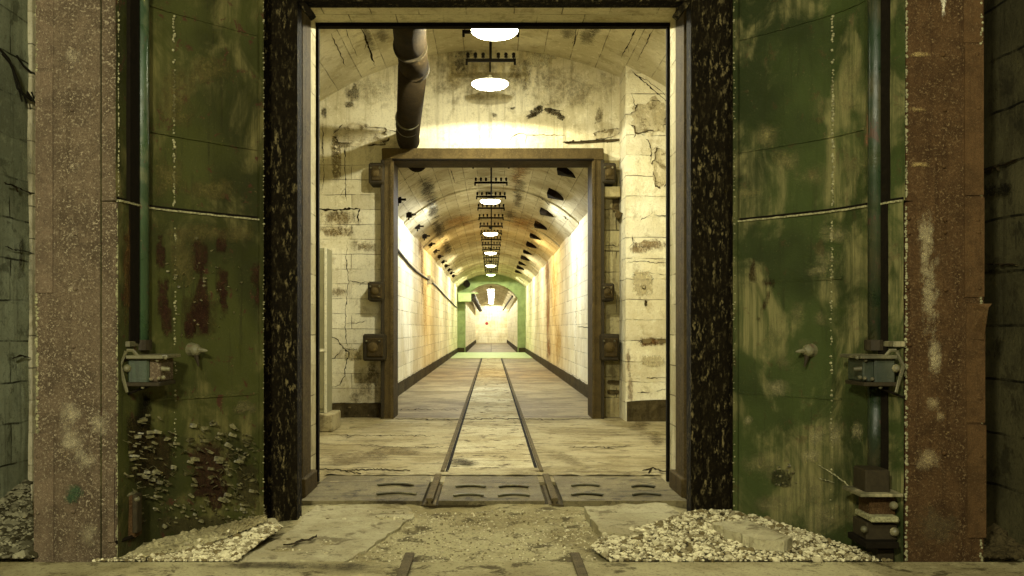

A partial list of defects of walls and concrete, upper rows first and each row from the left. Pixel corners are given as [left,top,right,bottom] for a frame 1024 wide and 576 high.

crack [331,29,374,64]
spalling [331,122,390,178]
spalling [527,106,565,121]
crack [621,30,666,164]
spalling [630,95,666,136]
spalling [652,148,666,189]
rust [156,236,171,335]
rust [184,231,228,338]
crack [320,130,367,387]
peeling [115,209,265,558]